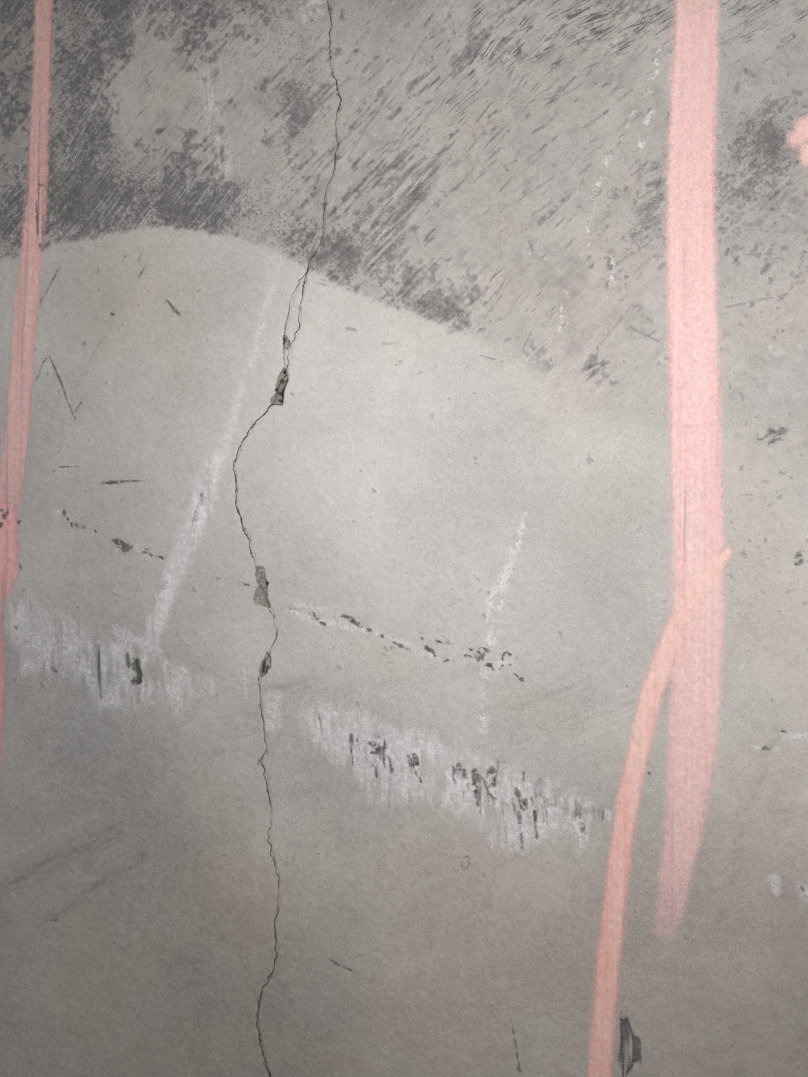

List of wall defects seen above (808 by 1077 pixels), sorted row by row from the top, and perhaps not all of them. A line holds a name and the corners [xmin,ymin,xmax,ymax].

crack [232,1,342,1077]